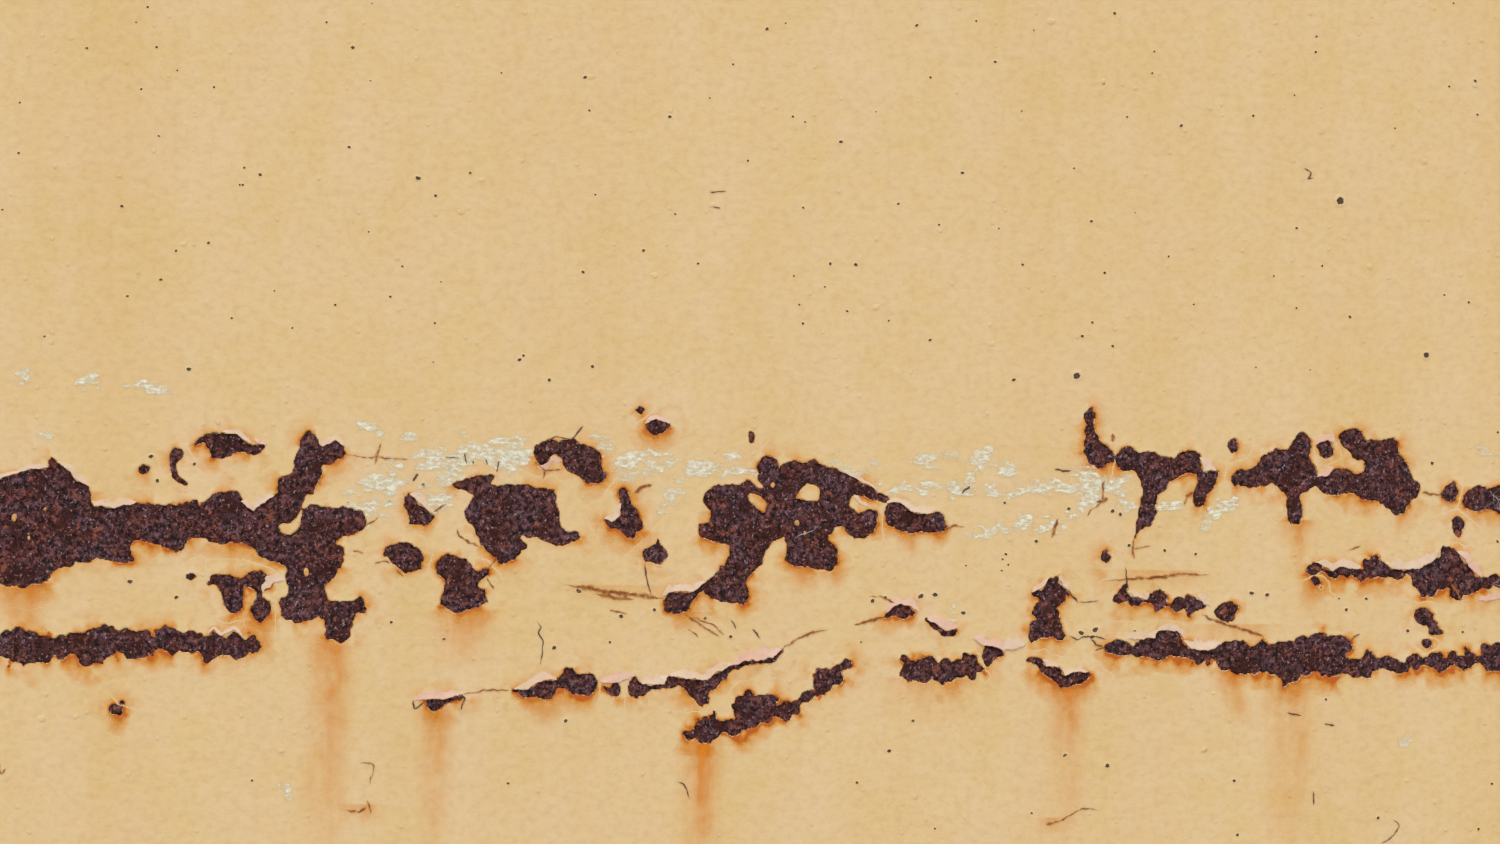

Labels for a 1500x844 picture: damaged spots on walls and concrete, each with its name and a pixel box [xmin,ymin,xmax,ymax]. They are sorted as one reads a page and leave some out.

corrosion [0,429,370,673]
corrosion [383,439,667,622]
corrosion [661,431,949,620]
corrosion [880,575,1096,717]
corrosion [1079,406,1421,540]
corrosion [1098,481,1500,695]